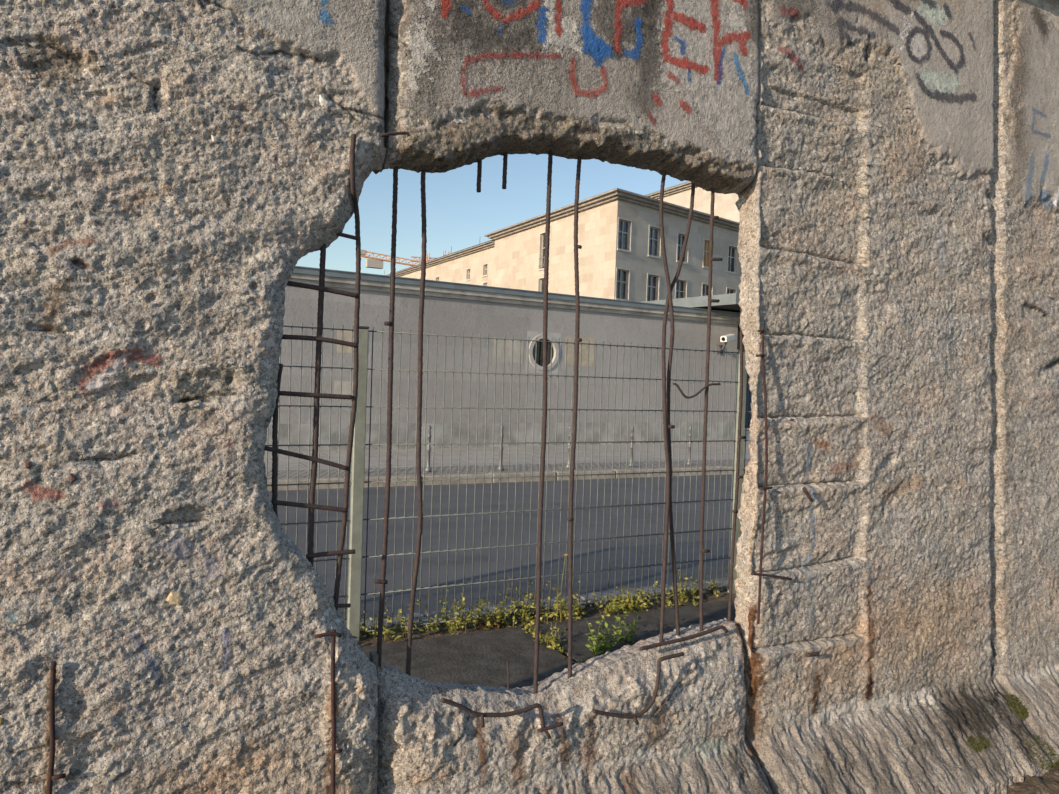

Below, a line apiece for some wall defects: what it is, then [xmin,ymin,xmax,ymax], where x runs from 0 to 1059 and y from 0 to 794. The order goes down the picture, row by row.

spalling [373,0,961,763]
corrosion [736,607,765,770]
corrosion [865,586,874,700]